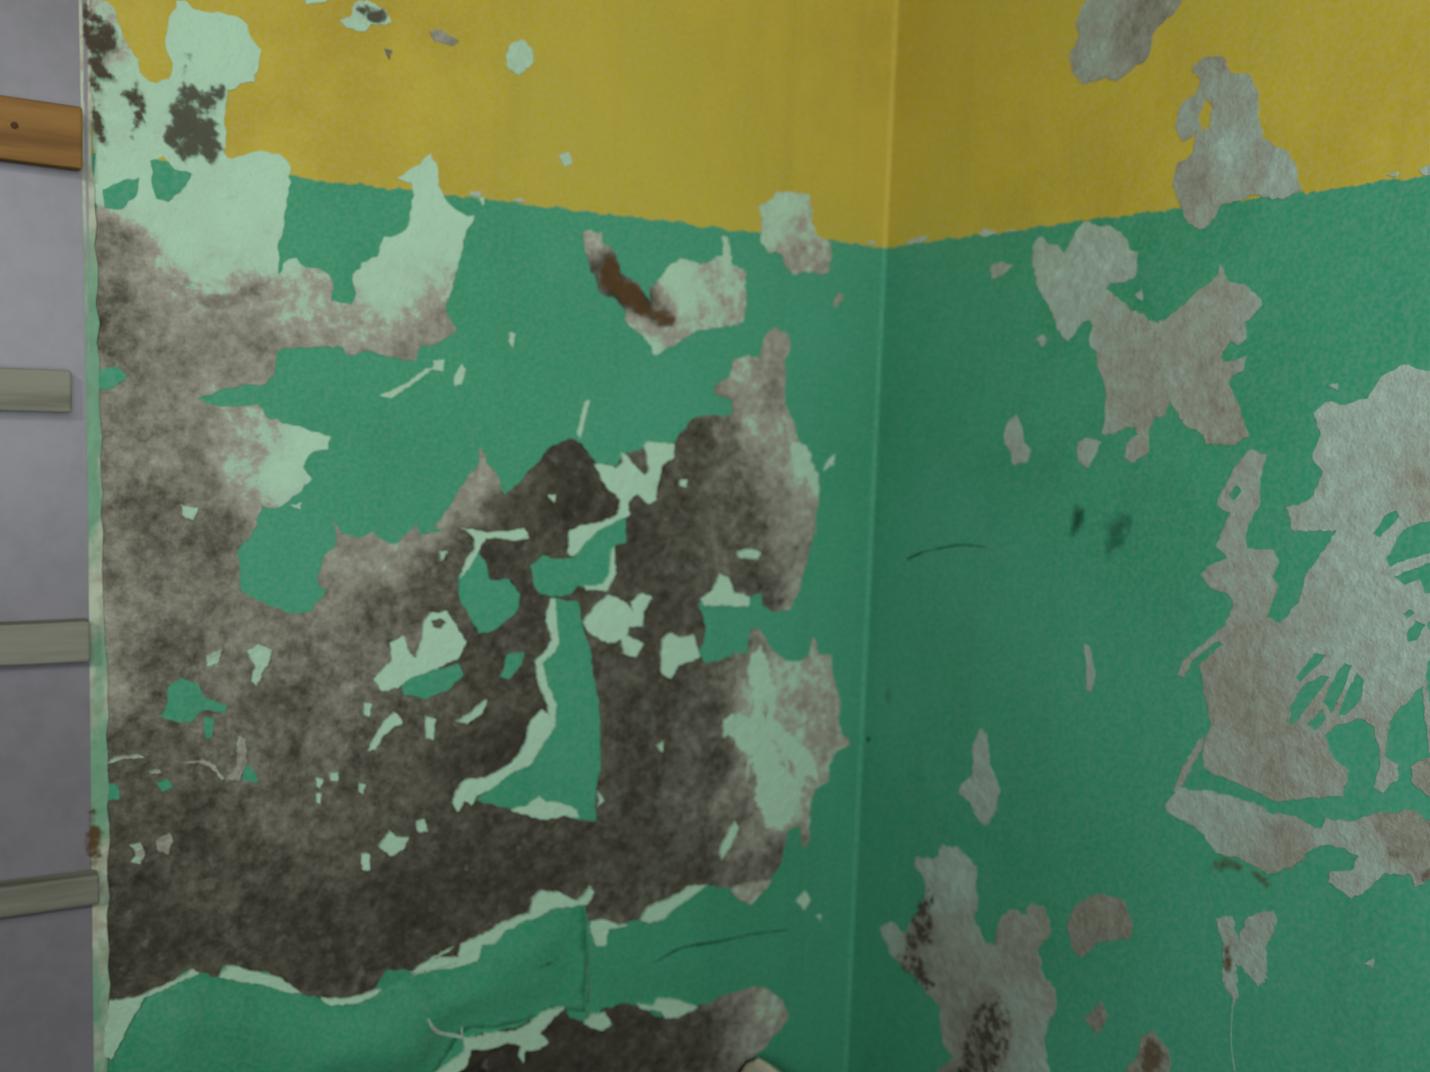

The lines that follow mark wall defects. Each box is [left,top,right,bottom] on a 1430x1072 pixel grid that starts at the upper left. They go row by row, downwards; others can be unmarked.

peeling [1069,0,1182,84]
peeling [1173,56,1302,229]
peeling [990,261,1013,280]
peeling [1004,414,1031,465]
peeling [83,0,850,1059]
peeling [1032,221,1430,899]
peeling [959,728,1000,825]
peeling [880,844,1133,1072]
peeling [435,986,789,1072]